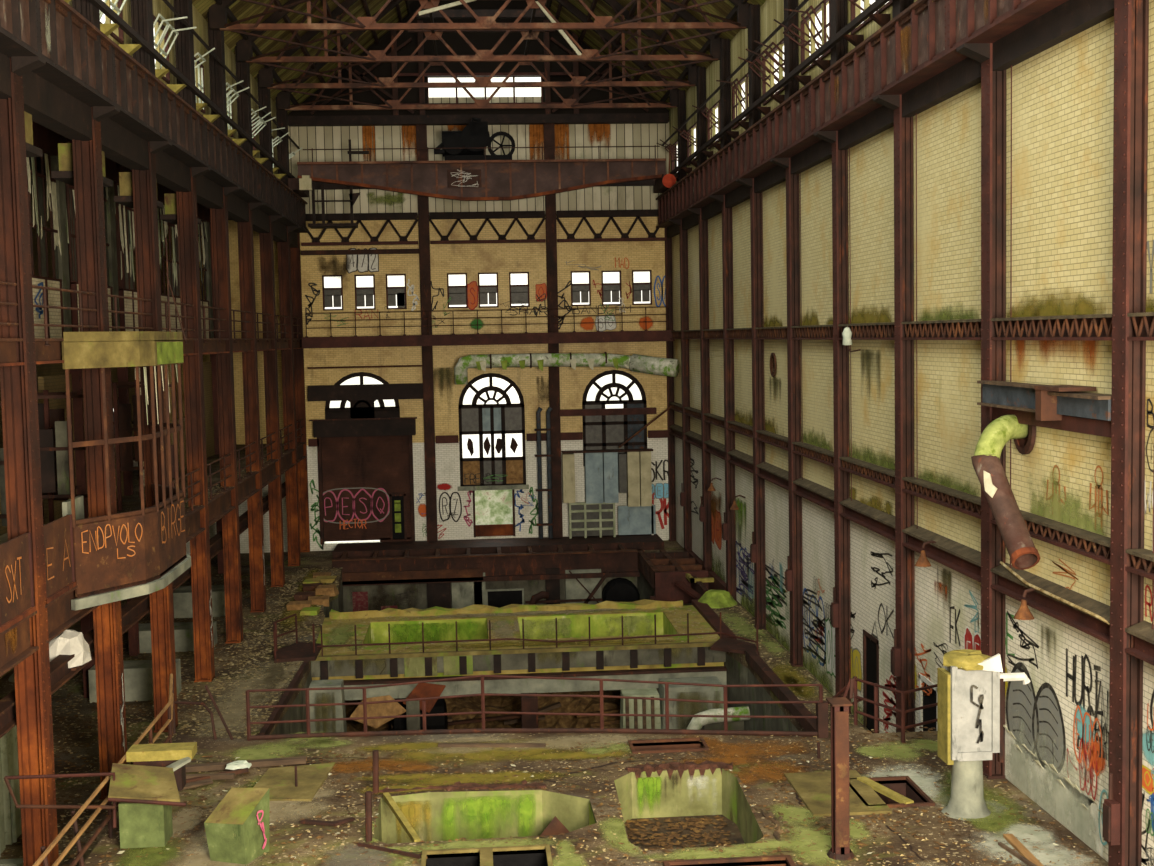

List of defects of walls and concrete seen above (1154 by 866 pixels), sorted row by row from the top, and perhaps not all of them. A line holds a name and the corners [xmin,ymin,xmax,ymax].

rust [362,126,375,161]
rust [402,126,417,158]
rust [529,124,569,160]
rust [588,124,610,142]
leakage [861,351,880,374]